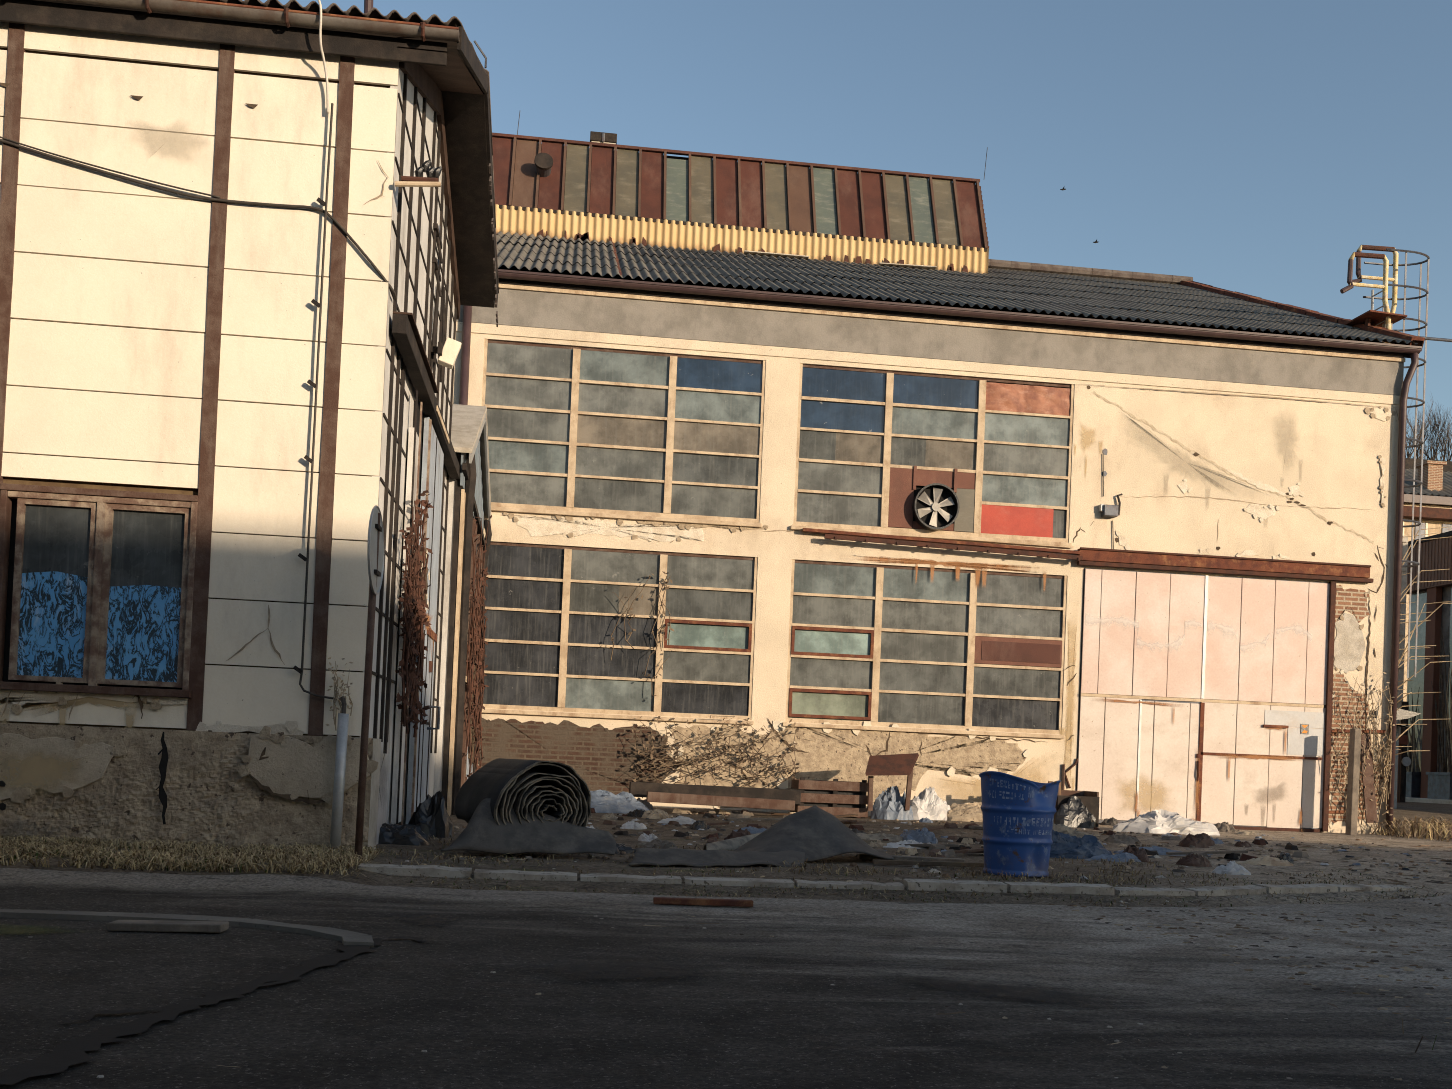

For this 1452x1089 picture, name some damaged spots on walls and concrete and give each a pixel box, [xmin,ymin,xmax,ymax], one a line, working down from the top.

crack [1132,496,1370,540]
peeling [1244,483,1306,523]
flaking render [1328,585,1383,829]
flaking render [478,718,1031,803]